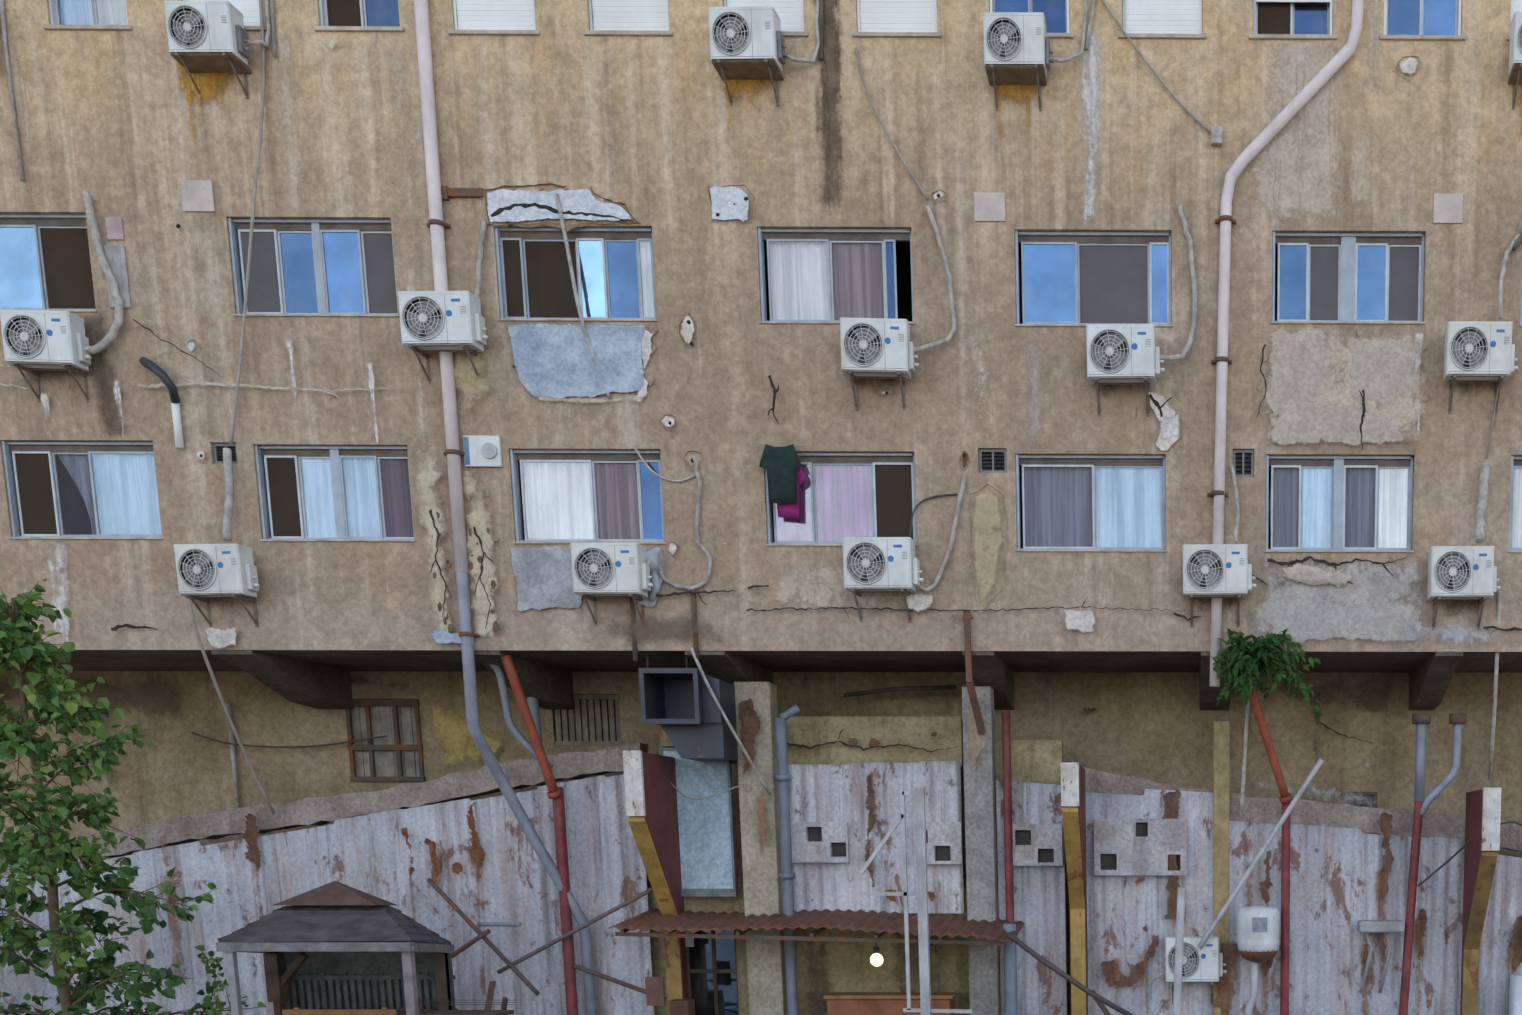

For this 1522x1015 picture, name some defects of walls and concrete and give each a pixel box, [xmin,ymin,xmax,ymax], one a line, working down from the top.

water stain [816,0,841,203]
spalling [481,181,642,231]
peeling [1257,327,1431,447]
crack [429,510,494,629]
peeling [1254,552,1425,643]
corrosion [1161,790,1181,819]
corrosion [400,802,486,928]
corrosion [1101,854,1186,1008]
corrosion [1508,915,1522,984]